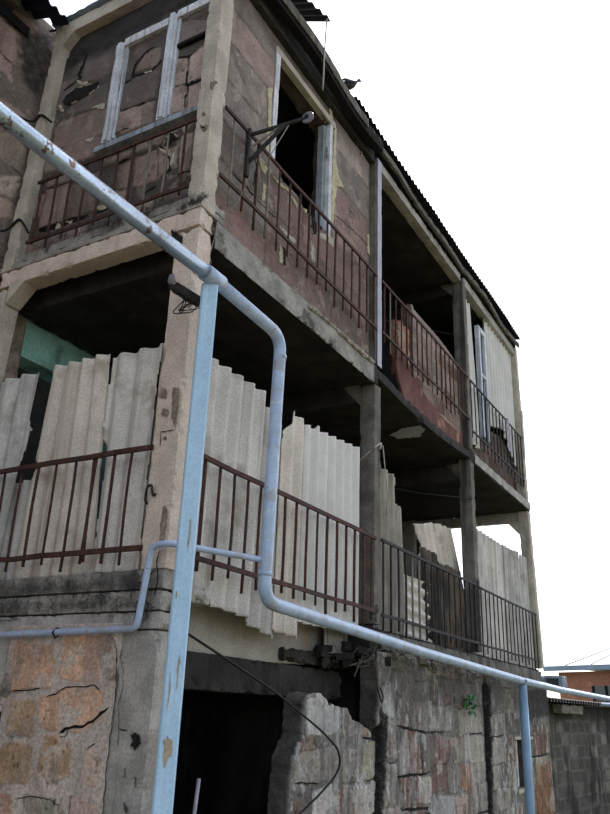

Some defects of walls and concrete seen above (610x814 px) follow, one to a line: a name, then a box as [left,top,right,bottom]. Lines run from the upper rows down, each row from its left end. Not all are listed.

spalling [59,80,100,112]
flaking render [390,426,425,439]
leakage [0,576,153,622]
crack [12,636,126,814]
spalling [130,732,141,750]
peeling [163,735,173,768]